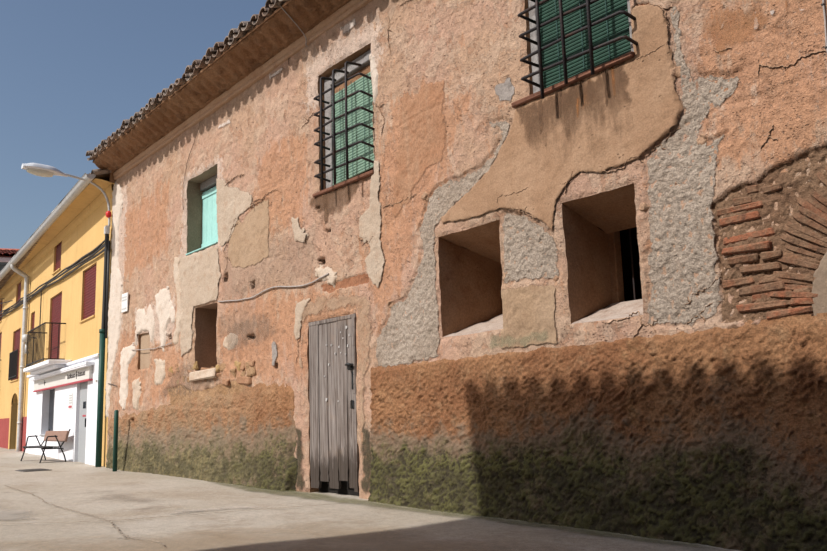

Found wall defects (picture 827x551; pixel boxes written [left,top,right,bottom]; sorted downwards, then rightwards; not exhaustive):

peeling [105,181,183,419]
peeling [291,217,308,242]
peeling [315,160,385,293]
spalling [376,120,509,367]
damp [517,62,628,140]
spalling [640,6,827,326]
crack [758,50,826,74]